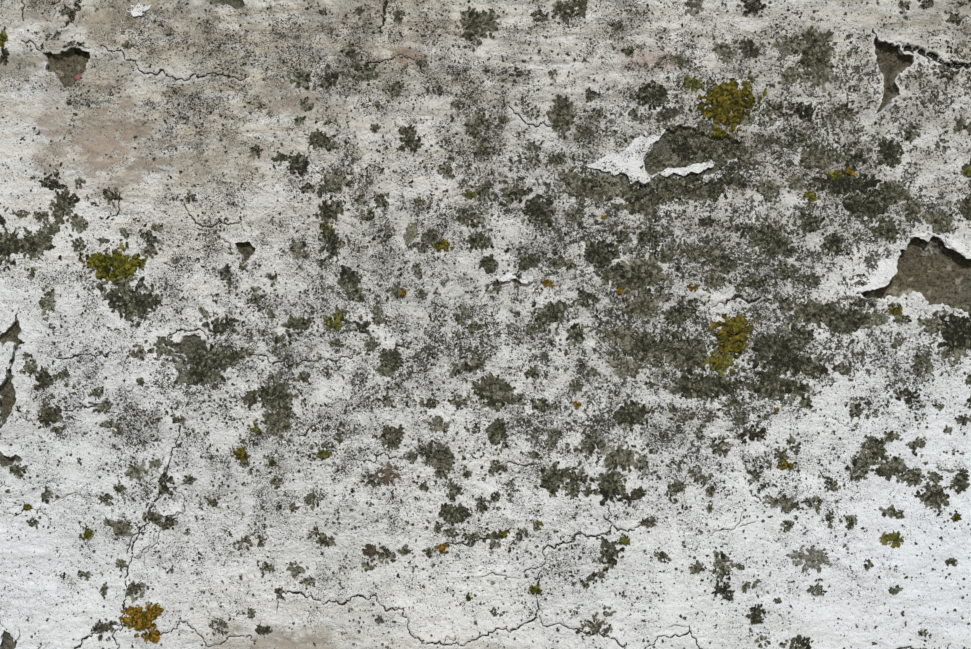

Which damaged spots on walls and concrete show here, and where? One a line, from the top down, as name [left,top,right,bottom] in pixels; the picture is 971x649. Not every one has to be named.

spalling [205,0,247,11]
crack [379,0,388,29]
spalling [41,45,93,91]
crack [885,42,971,69]
peeling [586,126,737,184]
spalling [853,231,971,320]
spalling [0,304,27,475]
crack [0,485,91,526]
crack [74,425,186,649]
crack [276,504,703,649]